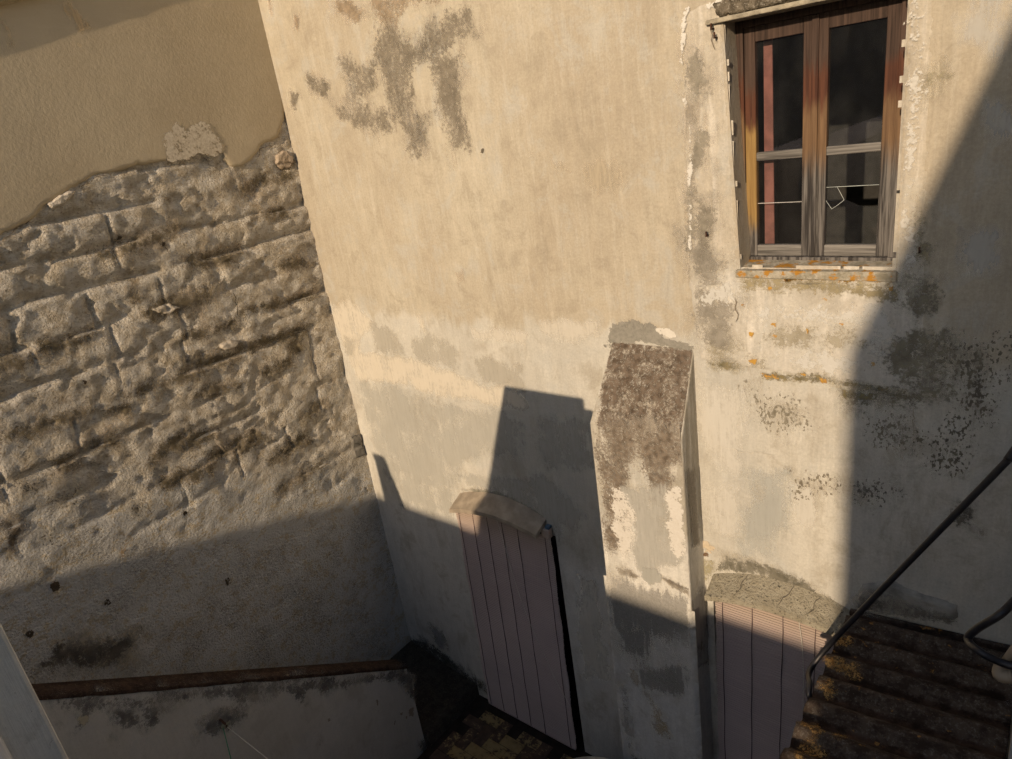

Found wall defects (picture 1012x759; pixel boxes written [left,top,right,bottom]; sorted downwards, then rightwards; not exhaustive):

leakage [336,0,484,159]
leakage [684,46,711,97]
flaking render [162,121,222,163]
leakage [689,119,709,169]
flaking render [46,191,74,209]
leakage [682,185,735,370]
flaking render [656,328,676,338]
leakage [738,274,1012,477]